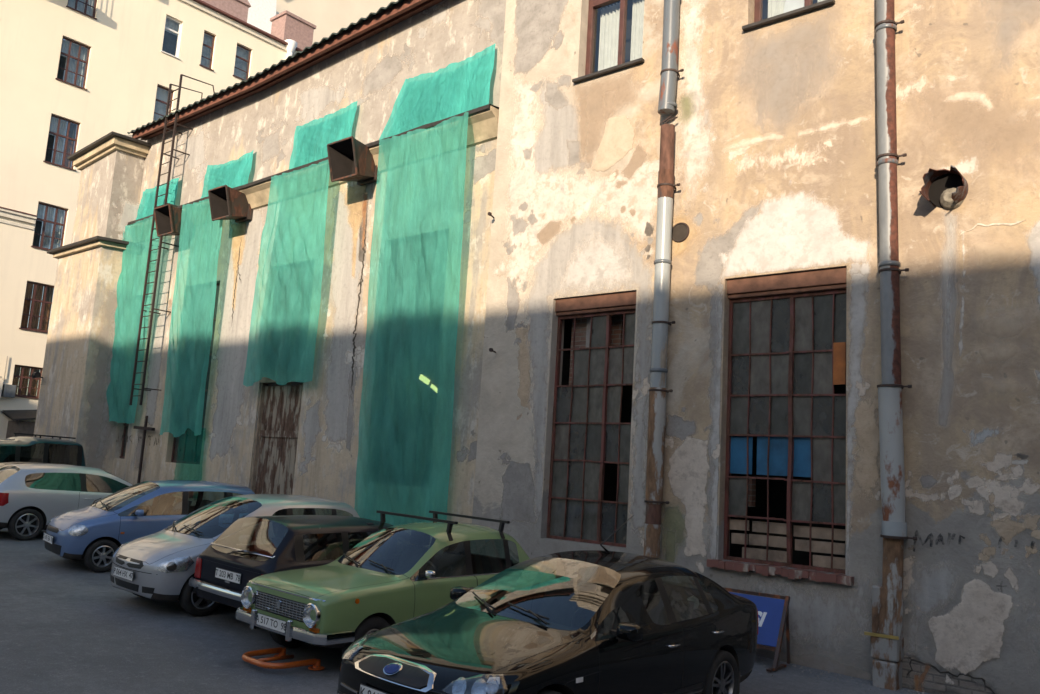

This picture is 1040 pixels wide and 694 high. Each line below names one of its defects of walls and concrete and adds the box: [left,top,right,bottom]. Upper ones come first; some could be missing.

crack [350,217,367,398]
flaking render [470,0,660,420]
peeling [850,262,870,275]
crack [961,220,1025,235]
flaking render [665,436,720,574]
spalling [903,453,1040,685]
crack [904,657,995,694]